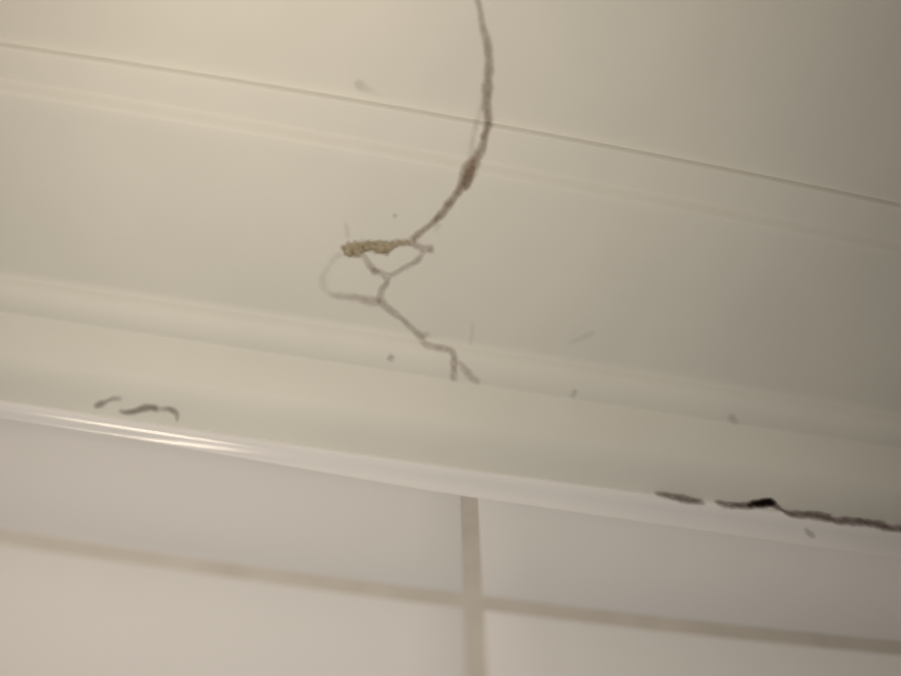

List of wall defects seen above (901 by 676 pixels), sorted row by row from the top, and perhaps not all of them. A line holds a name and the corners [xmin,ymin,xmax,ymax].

crack [434,122,489,221]
crack [727,499,901,530]